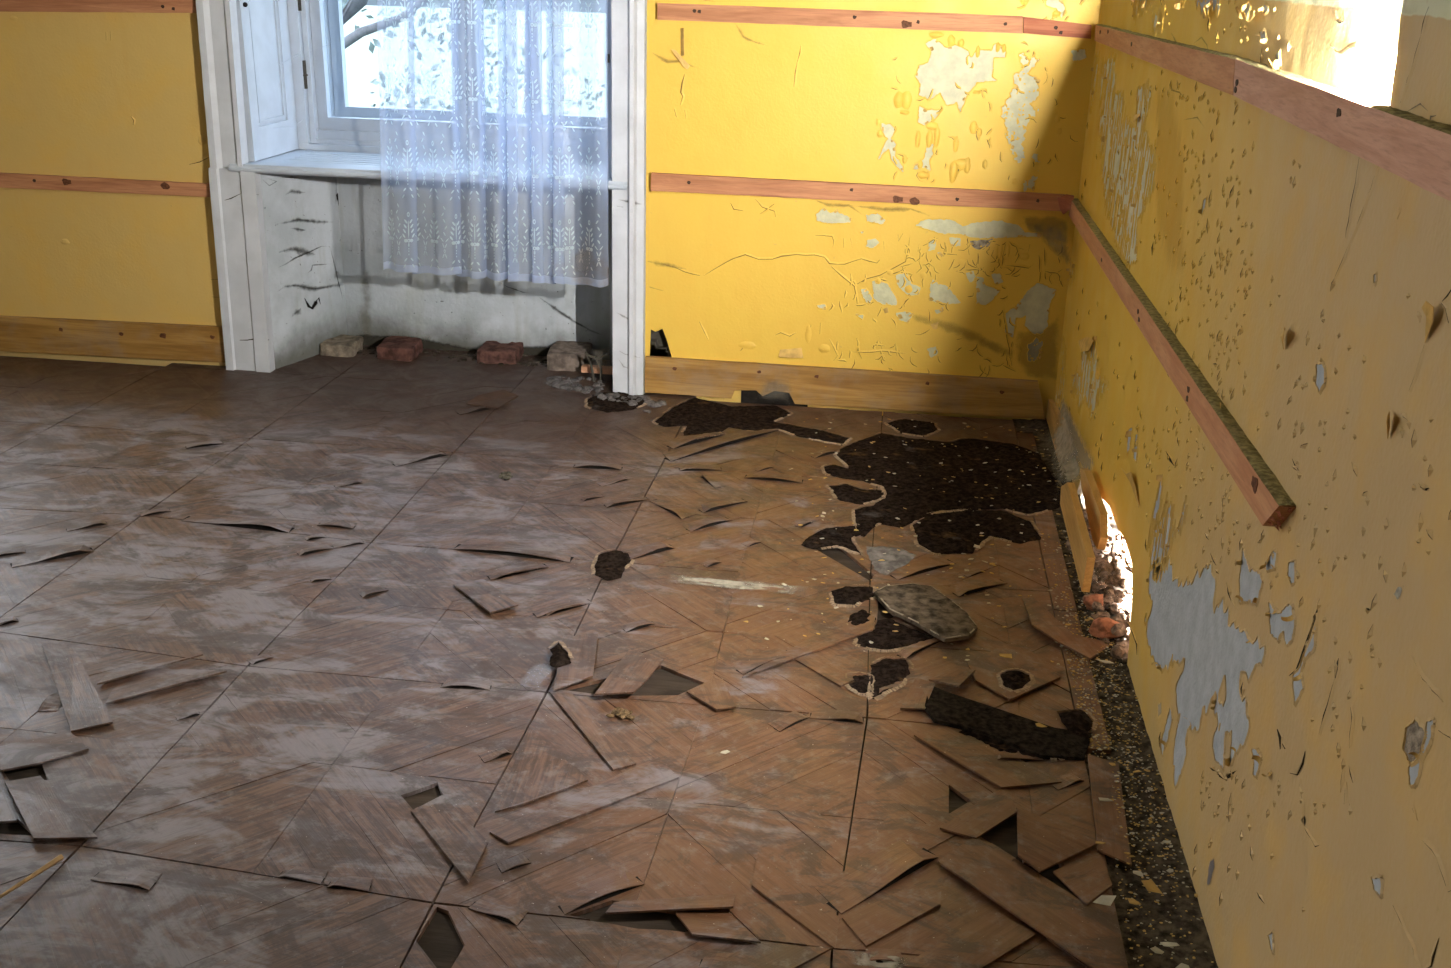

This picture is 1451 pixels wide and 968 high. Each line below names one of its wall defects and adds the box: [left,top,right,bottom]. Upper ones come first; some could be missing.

peeling [815,207,886,249]
crack [666,233,1065,377]
peeling [877,38,1041,192]
peeling [915,218,1043,257]
peeling [856,262,1109,421]
peeling [1070,48,1156,270]
peeling [1144,474,1318,790]
flaking render [1402,716,1436,789]